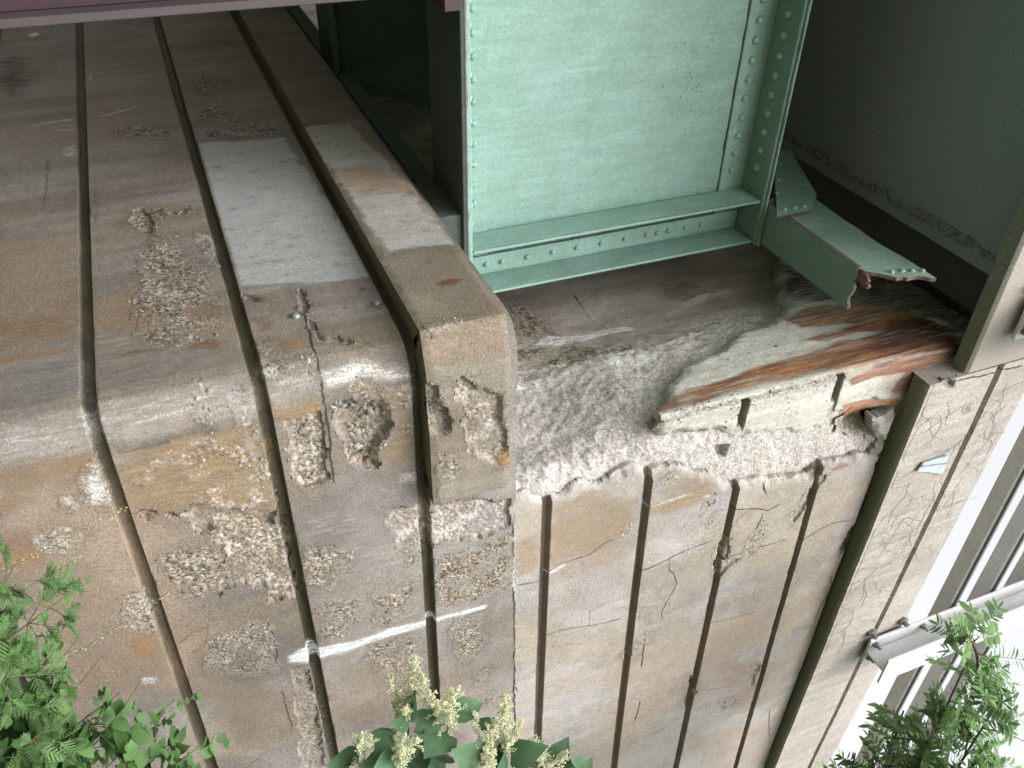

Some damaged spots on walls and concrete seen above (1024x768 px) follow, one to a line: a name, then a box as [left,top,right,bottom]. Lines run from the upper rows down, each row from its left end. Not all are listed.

spalling [783,131,997,264]
peeling [127,205,222,353]
crack [303,311,335,483]
rust [663,304,961,414]
spalling [115,284,884,684]
crack [549,366,1022,668]
peeling [200,618,331,768]